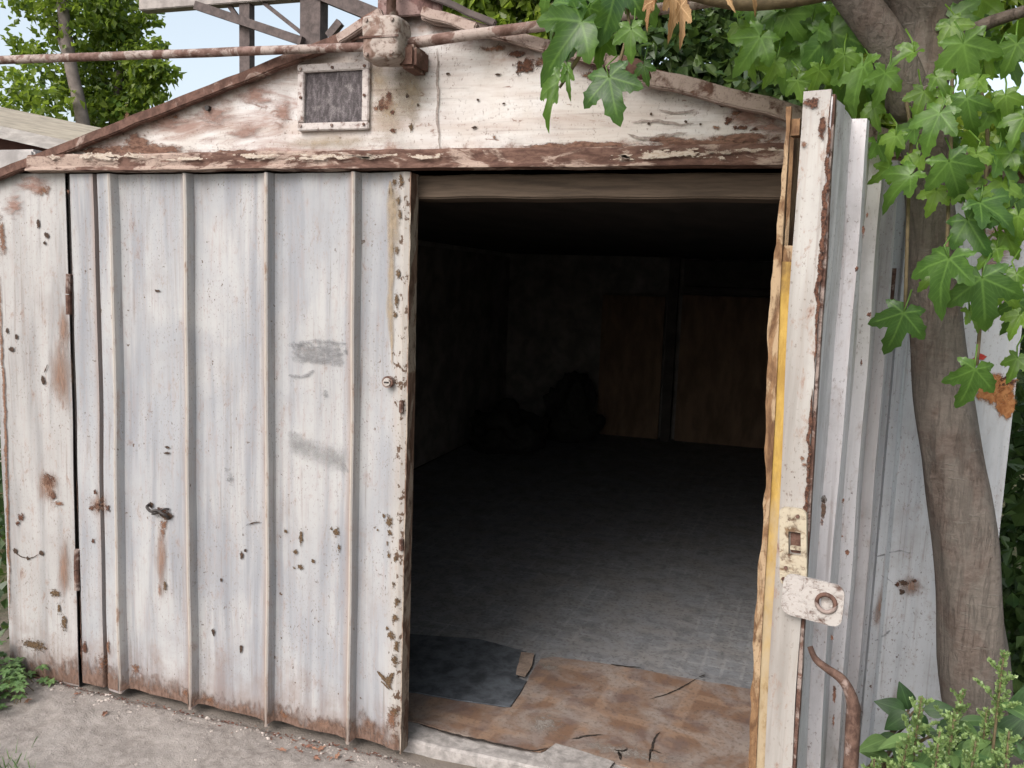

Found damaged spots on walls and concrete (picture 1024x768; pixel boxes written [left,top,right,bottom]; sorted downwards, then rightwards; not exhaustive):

corrosion [481,44,543,75]
peeling [47,152,207,161]
peeling [226,152,440,161]
peeling [611,147,784,160]
corrosion [5,176,50,212]
corrosion [800,94,837,566]
corrosion [975,373,1018,419]
corrosion [40,472,64,505]
corrosion [148,502,173,594]
corrosion [10,607,399,750]
corrosion [792,618,806,768]